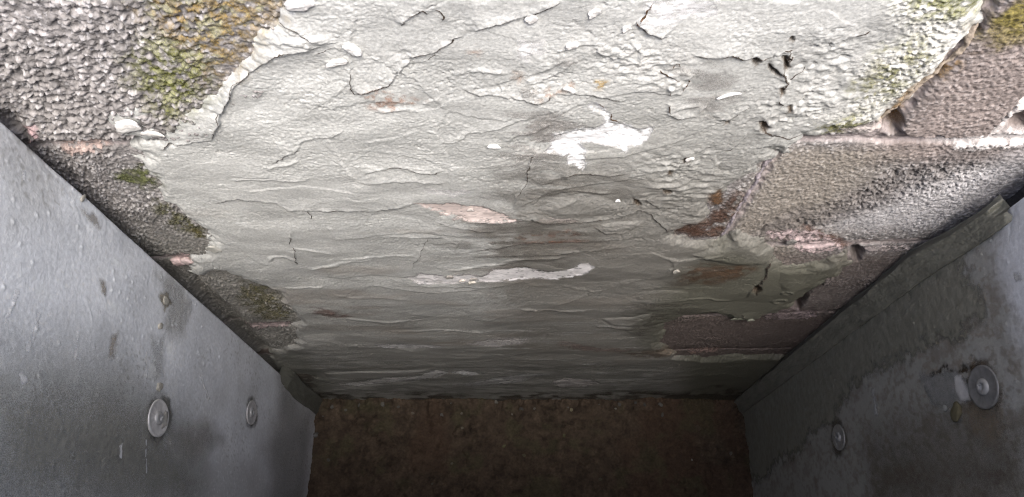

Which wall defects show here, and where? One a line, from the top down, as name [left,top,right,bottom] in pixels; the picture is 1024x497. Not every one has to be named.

crack [401,10,454,60]
crack [349,75,390,95]
crack [652,50,805,128]
spalling [752,55,792,113]
peeling [61,119,165,156]
peeling [545,102,652,170]
crack [728,108,807,140]
peeling [947,127,1024,150]
peeling [416,189,521,223]
corrosion [675,190,744,237]
peeling [766,229,841,253]
peeling [406,263,595,285]